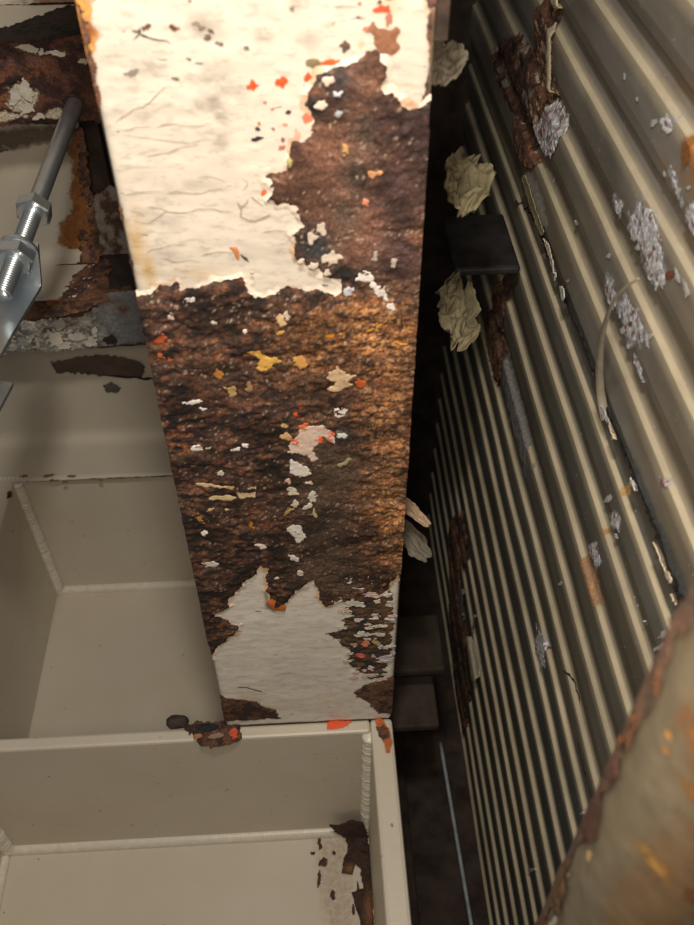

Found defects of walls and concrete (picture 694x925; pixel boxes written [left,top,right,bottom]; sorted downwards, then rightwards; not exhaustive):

corrosion [0,0,102,127]
crack [114,86,212,157]
peeling [275,76,288,89]
peeling [303,40,350,87]
peeling [362,0,400,56]
corrosion [489,0,569,229]
crack [126,176,279,232]
crack [148,244,235,262]
corrosion [41,0,436,662]
peeling [326,576,398,682]
corrosion [166,695,281,749]
corrosion [310,820,374,925]